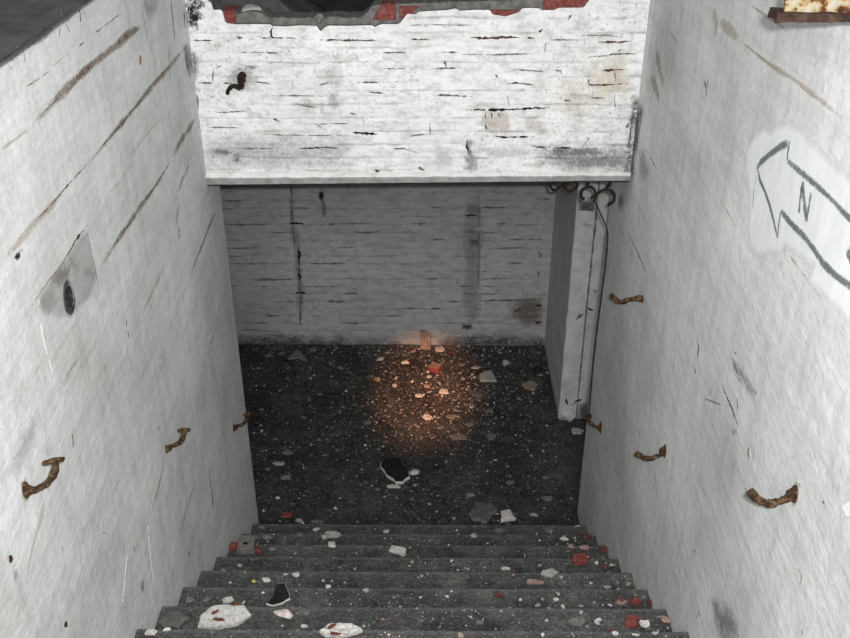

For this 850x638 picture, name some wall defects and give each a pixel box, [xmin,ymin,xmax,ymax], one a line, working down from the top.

corrosion [44,27,138,112]
corrosion [30,58,176,227]
flaking render [32,226,98,305]
crack [289,185,306,325]